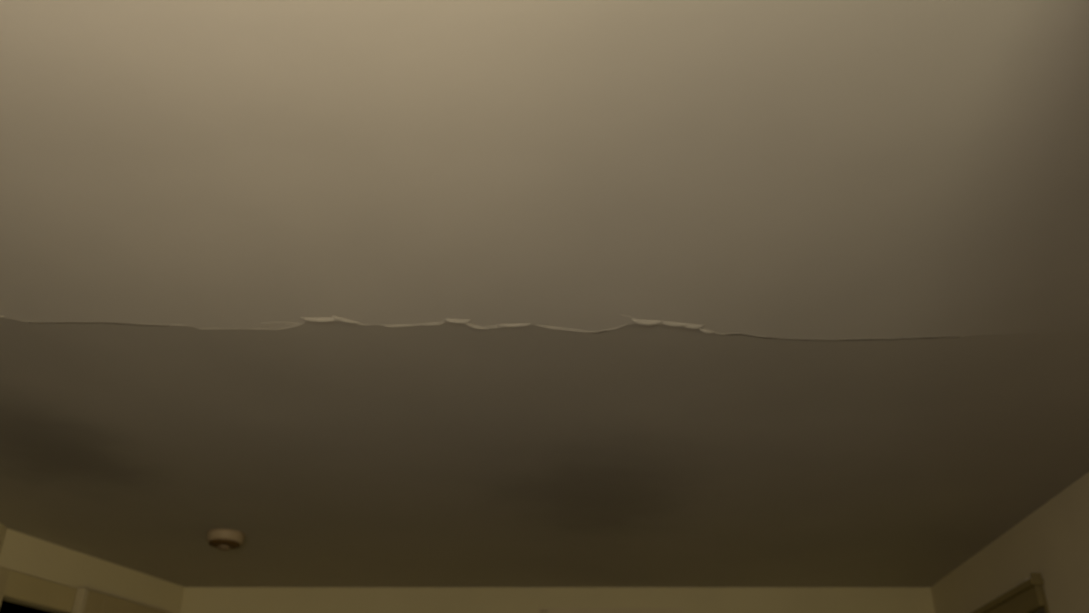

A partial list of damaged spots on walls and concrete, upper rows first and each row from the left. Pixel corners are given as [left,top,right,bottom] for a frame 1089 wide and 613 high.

crack [0,315,968,341]